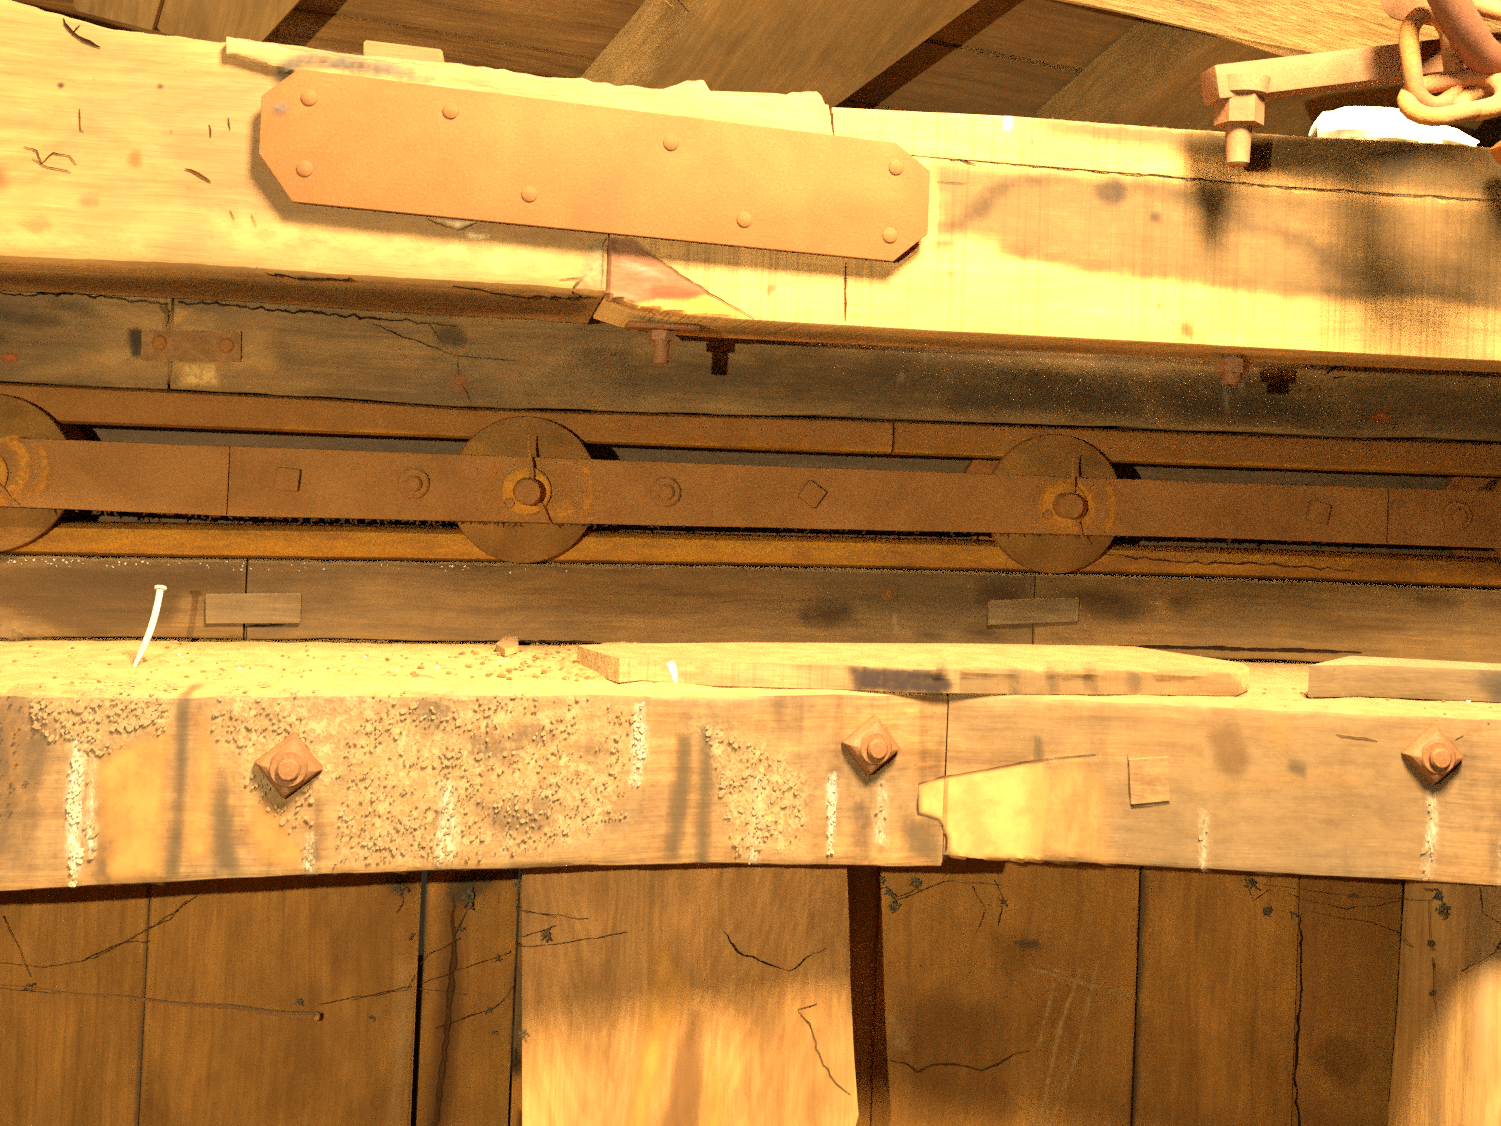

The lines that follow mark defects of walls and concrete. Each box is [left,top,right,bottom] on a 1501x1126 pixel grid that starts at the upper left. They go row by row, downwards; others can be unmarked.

crack [452,237,607,301]
crack [0,272,518,400]
corrosion [0,435,49,503]
corrosion [1038,480,1116,534]
water stain [632,702,647,786]
water stain [66,746,105,887]
water stain [671,731,708,862]
water stain [827,775,837,855]
crack [722,930,826,971]
crack [433,894,458,1126]
crack [798,1004,850,1094]
crack [1293,916,1303,1126]